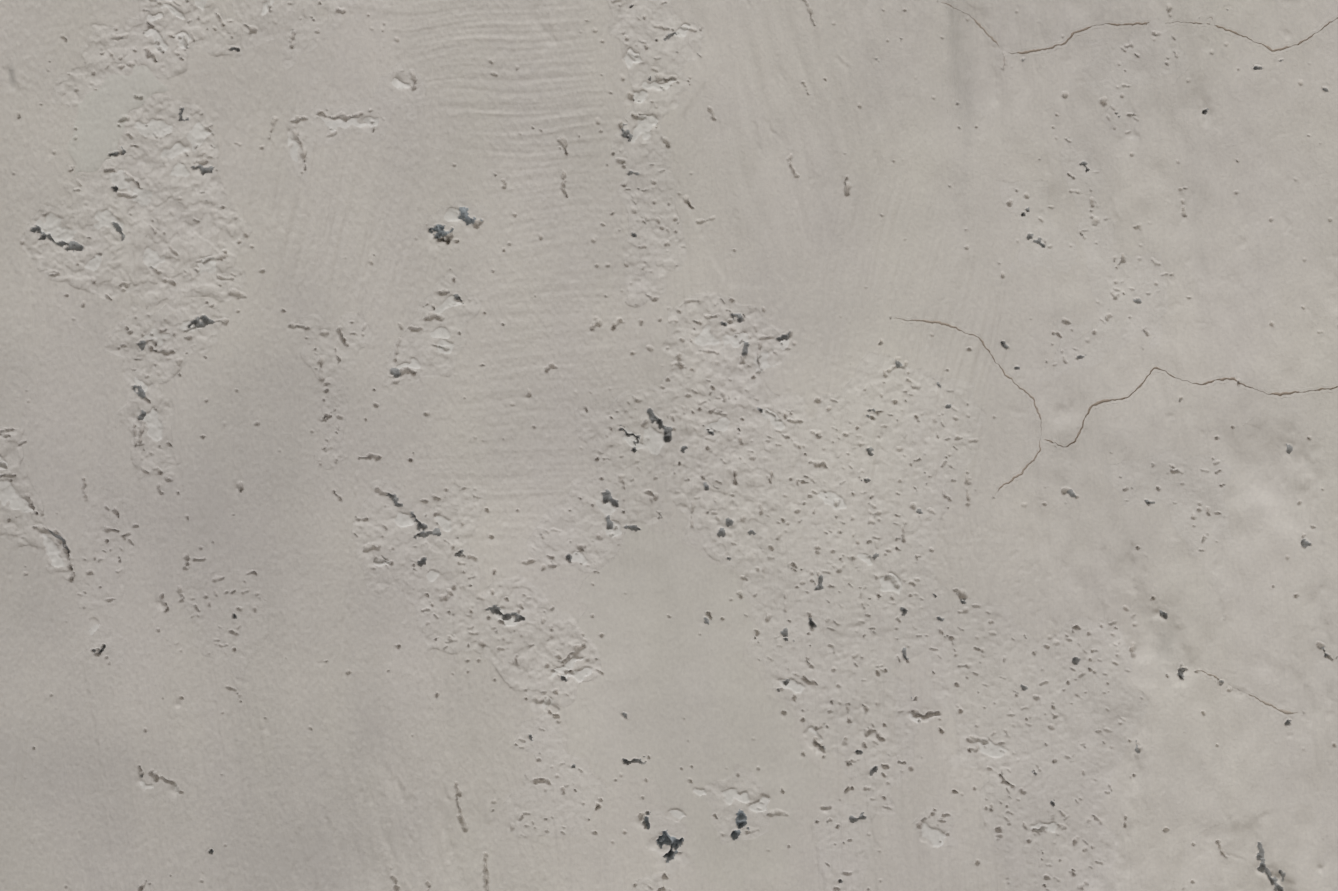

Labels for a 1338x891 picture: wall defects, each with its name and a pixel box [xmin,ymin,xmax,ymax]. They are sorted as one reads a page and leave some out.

crack [937,0,1338,68]
flaking render [21,0,253,480]
flaking render [297,310,372,470]
flaking render [383,270,482,388]
peeling [429,207,483,238]
flaking render [527,0,790,588]
crack [891,315,1338,498]
flaking render [0,426,140,610]
flaking render [351,479,602,713]
crack [1193,666,1303,717]
flaking render [632,810,686,891]
peeling [693,788,770,840]